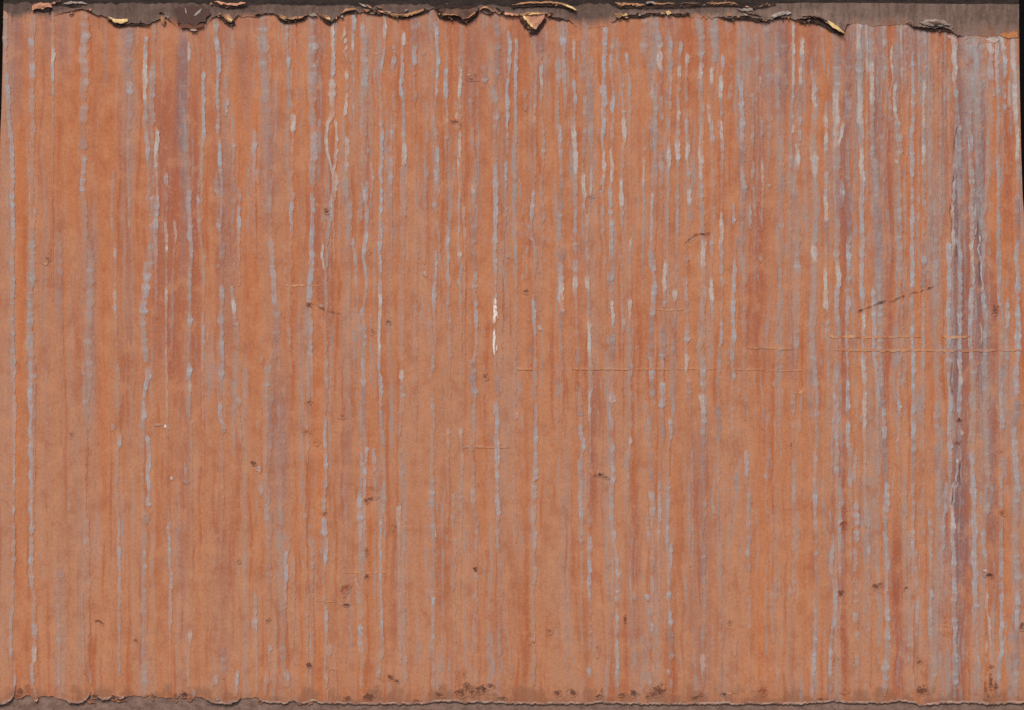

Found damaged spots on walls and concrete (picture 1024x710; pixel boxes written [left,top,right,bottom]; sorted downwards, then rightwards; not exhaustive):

peeling [32,0,149,27]
peeling [210,1,577,34]
peeling [614,0,844,35]
peeling [908,19,1018,45]
rust [433,672,508,700]
rust [617,680,672,699]
rust [983,663,1000,701]